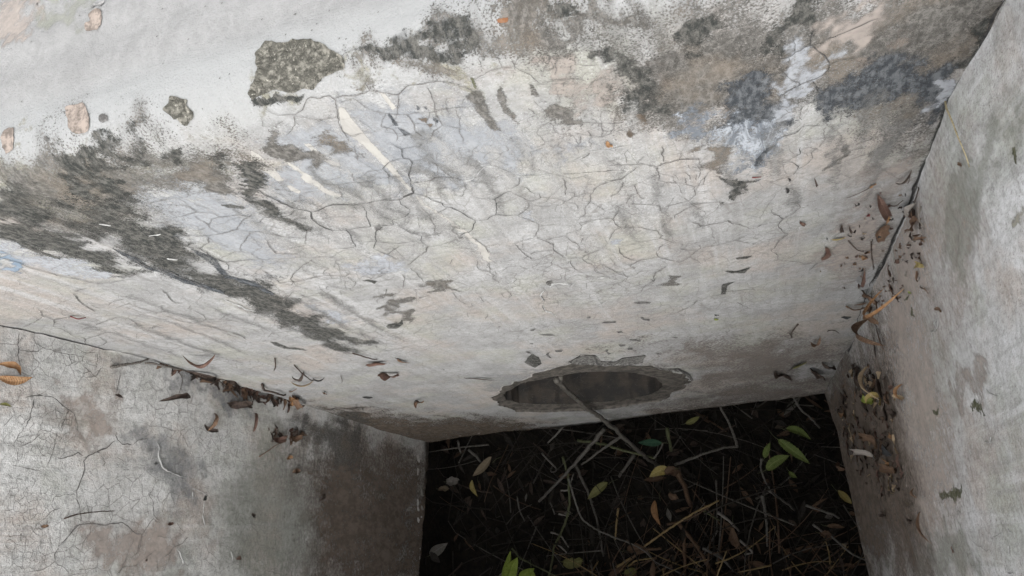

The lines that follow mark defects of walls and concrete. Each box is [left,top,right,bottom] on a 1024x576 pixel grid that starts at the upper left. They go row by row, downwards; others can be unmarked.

spalling [163,96,194,126]
spalling [248,39,345,100]
crack [2,18,944,460]
leakage [0,0,1003,354]
crack [973,0,1005,58]
crack [3,395,187,573]